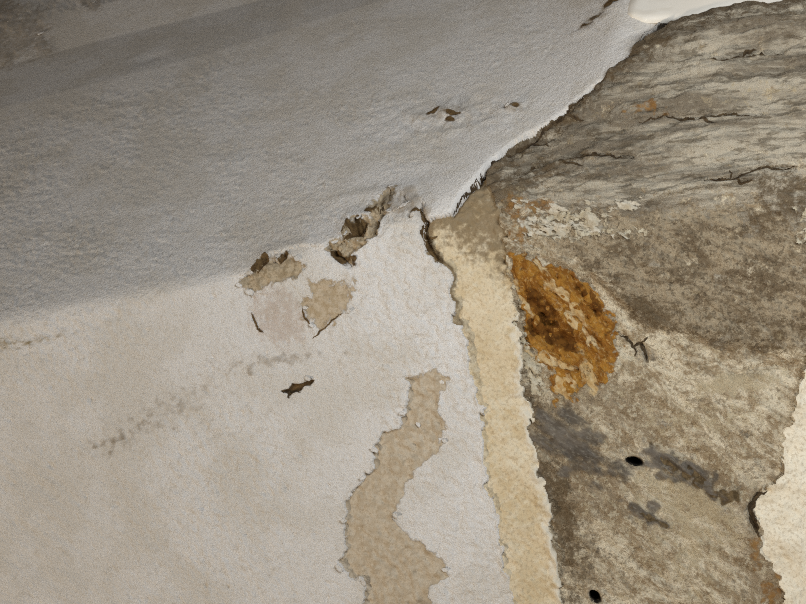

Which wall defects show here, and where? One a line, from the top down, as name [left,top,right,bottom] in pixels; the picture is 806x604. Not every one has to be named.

spalling [324,184,409,266]
corrosion [507,195,555,242]
peeling [235,250,357,338]
corrosion [506,252,625,408]
spalling [282,376,314,398]
peeling [335,368,450,604]